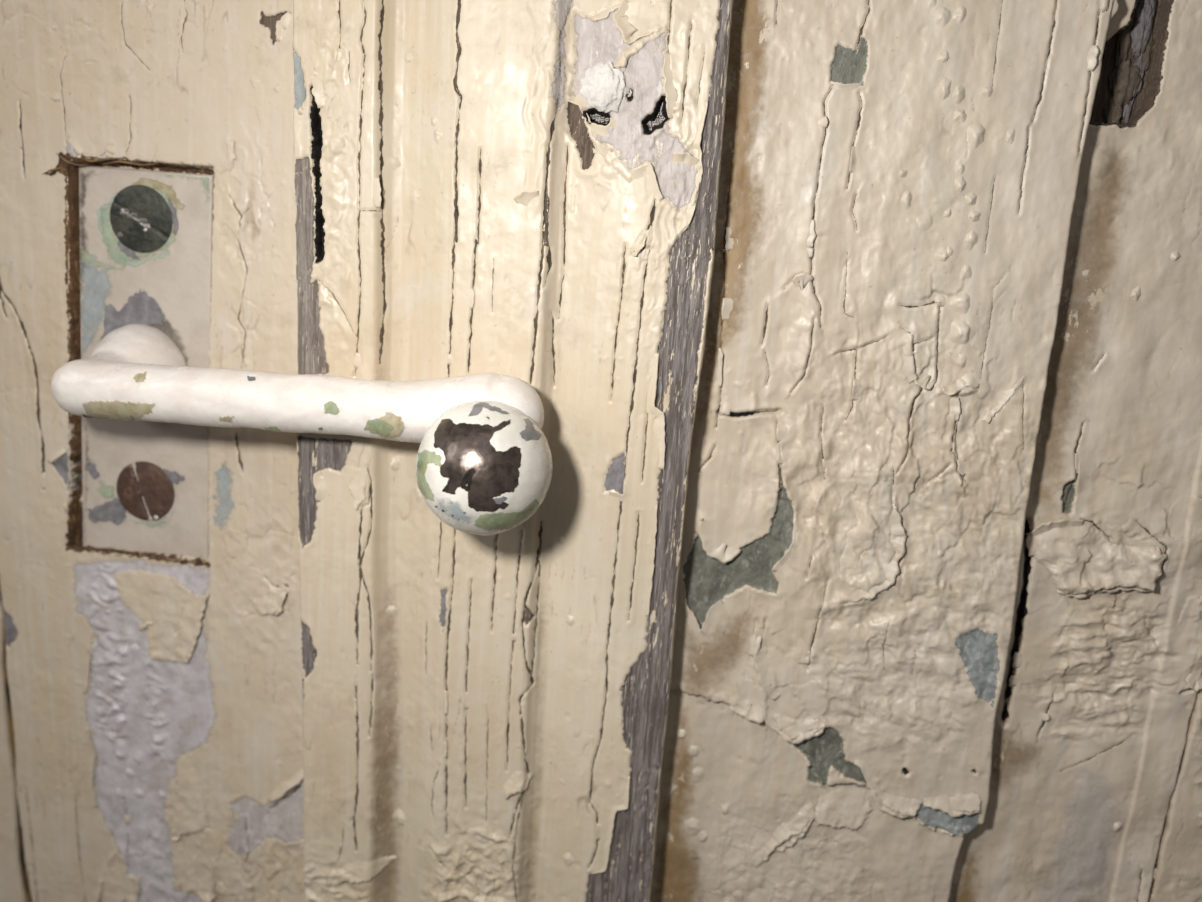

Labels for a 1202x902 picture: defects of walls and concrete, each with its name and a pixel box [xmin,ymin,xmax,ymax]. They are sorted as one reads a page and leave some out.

crack [0,282,46,489]
peeling [295,157,329,375]
peeling [297,435,352,548]
crack [447,0,494,377]
crack [530,9,570,386]
peeling [552,0,798,902]
crack [700,90,967,499]
crack [0,588,38,902]
peeling [73,559,217,902]
crack [425,521,542,902]
peeling [730,629,981,835]
peeling [955,629,1000,707]